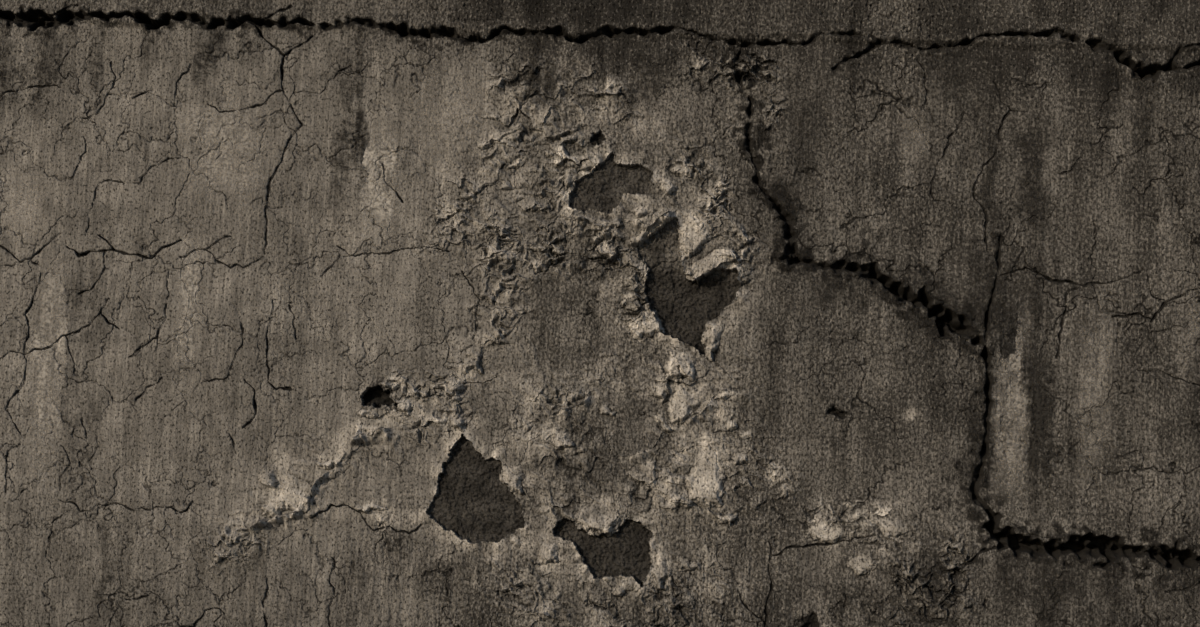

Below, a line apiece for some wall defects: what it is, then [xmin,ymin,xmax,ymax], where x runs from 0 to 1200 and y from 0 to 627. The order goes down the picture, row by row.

crack [0,5,1200,252]
crack [0,158,182,502]
crack [204,299,297,454]
flaking render [211,385,405,562]
crack [309,504,423,534]
flaking render [417,426,750,598]
flaking render [500,127,749,368]
flaking render [597,360,757,469]
crack [739,534,876,627]
flaking render [801,611,821,627]
flaking render [825,406,851,424]
crack [745,96,1200,574]